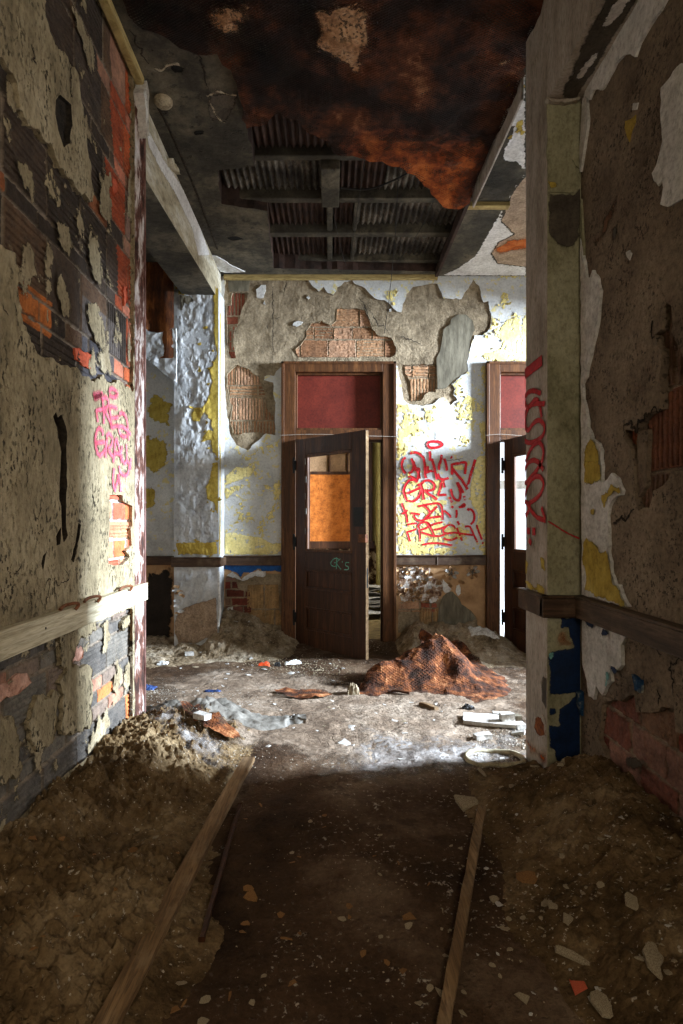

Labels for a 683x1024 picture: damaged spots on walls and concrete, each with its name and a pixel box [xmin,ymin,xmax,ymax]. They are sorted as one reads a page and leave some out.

flaking render [0,0,526,644]
peeling [545,0,683,607]
flaking render [0,608,131,833]
flaking render [527,618,683,820]